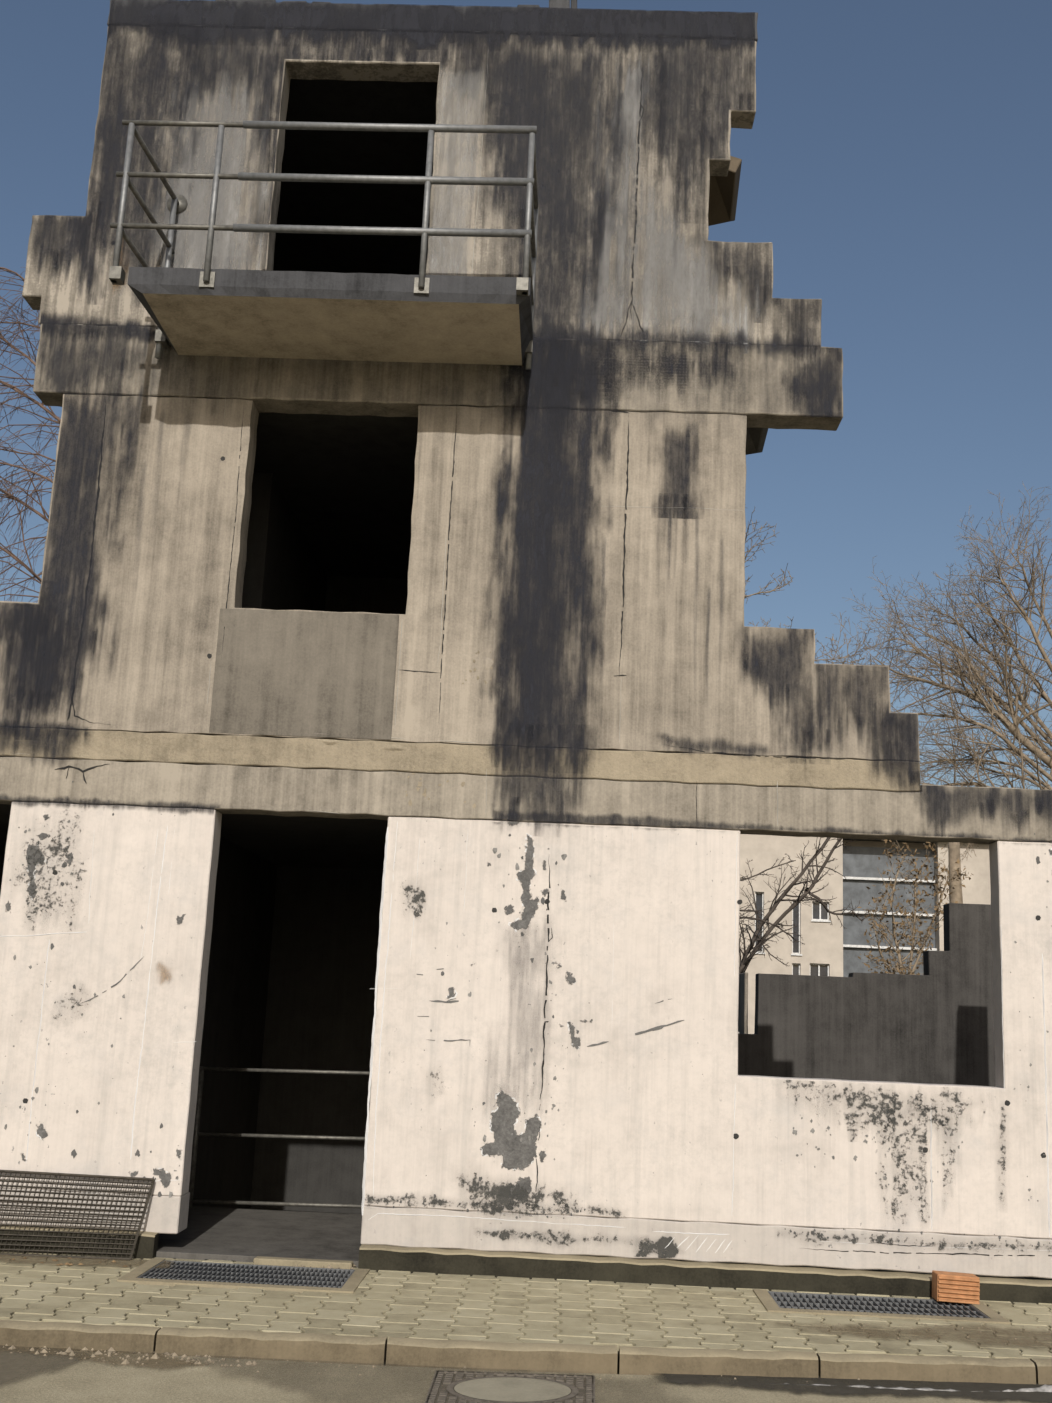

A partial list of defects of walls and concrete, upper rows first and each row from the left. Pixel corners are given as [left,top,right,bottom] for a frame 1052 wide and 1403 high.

water stain [34,0,842,829]
water stain [0,315,158,760]
water stain [742,628,1052,842]
peeling [6,814,73,918]
water stain [0,796,216,927]
peeling [441,971,471,999]
peeling [487,821,593,1049]
peeling [422,1048,585,1224]